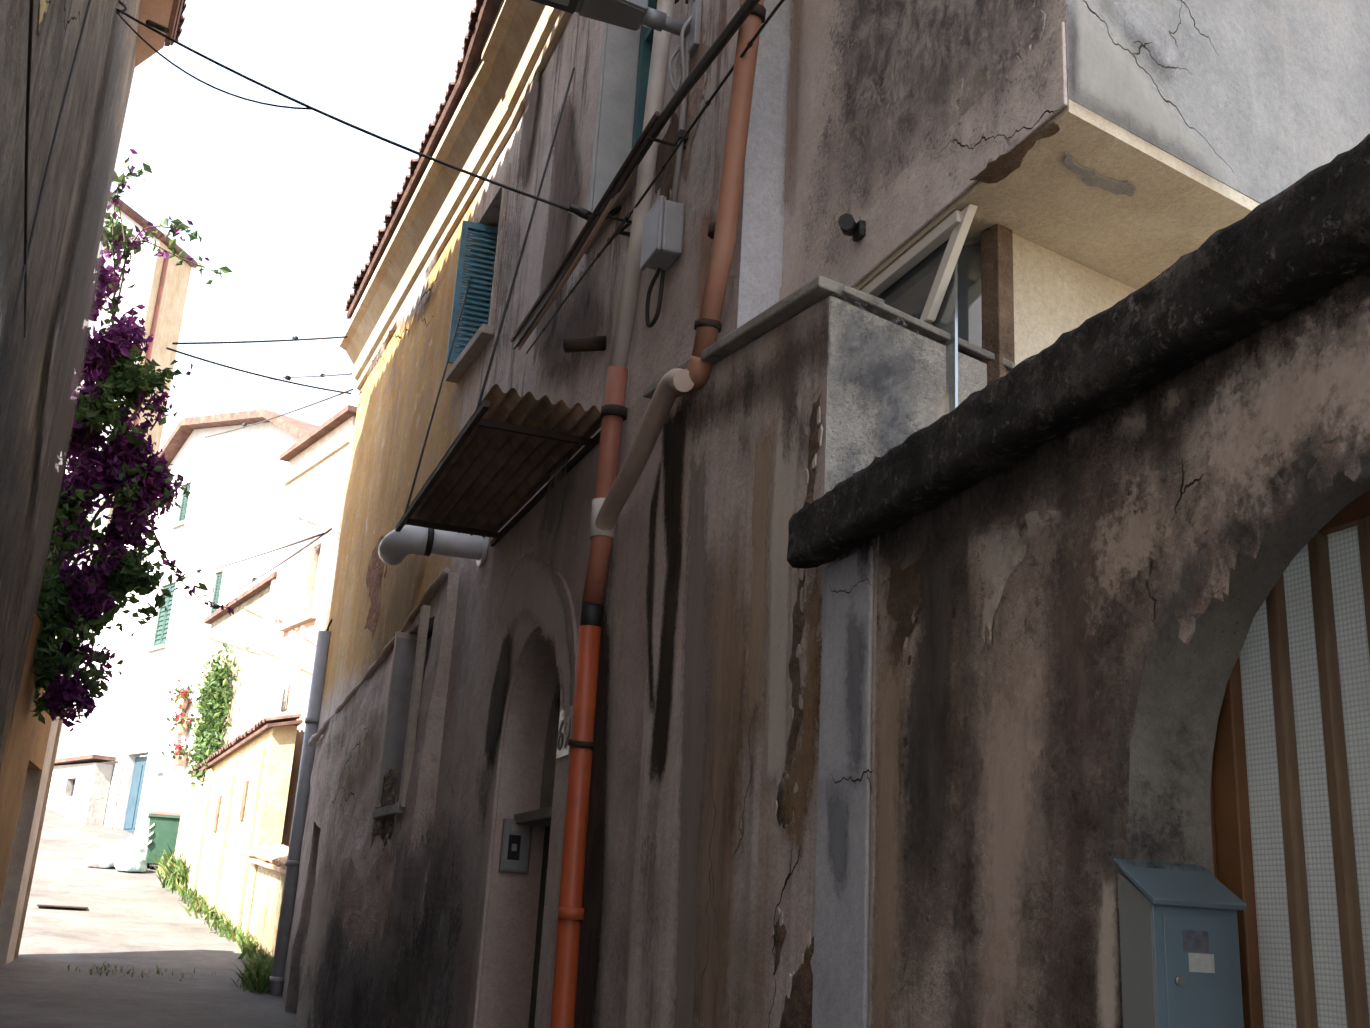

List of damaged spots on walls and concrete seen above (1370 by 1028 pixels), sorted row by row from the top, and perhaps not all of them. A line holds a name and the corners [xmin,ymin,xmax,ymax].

water stain [804,0,1068,267]
crack [933,109,1060,160]
peeling [1064,152,1136,197]
crack [1083,0,1233,171]
spalling [364,535,387,643]
water stain [307,629,511,1028]
water stain [645,304,831,1028]
crack [699,568,873,1028]
crack [803,391,823,508]
water stain [840,273,1370,1028]
peeling [1084,299,1370,644]
spalling [771,908,814,1028]